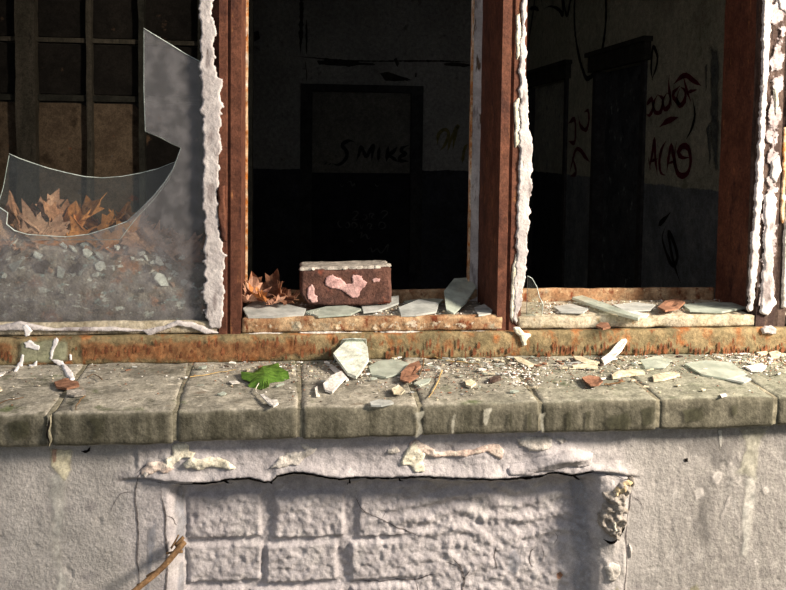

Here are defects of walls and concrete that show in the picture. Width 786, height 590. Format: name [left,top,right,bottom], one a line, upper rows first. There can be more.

corrosion [75,335,339,363]
corrosion [386,339,513,360]
corrosion [536,341,785,357]
damp [9,421,29,441]
damp [415,412,424,437]
damp [641,407,655,426]
peeling [387,439,504,472]
damp [735,428,768,556]
flaking render [597,476,635,541]
crack [109,465,146,583]
crack [158,471,642,590]
flaking render [603,563,621,581]